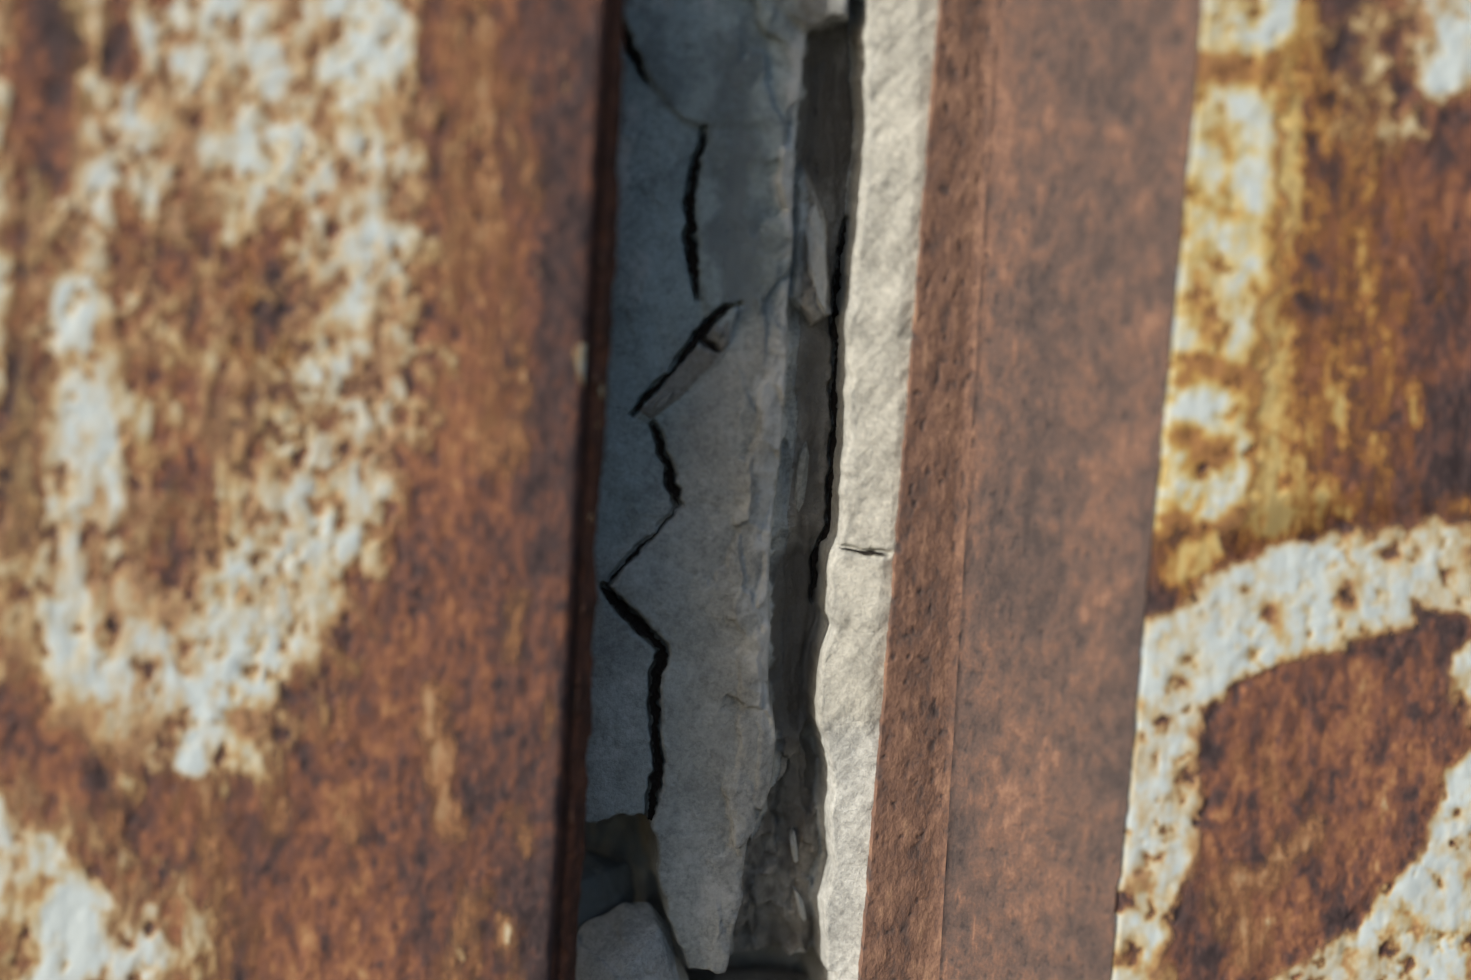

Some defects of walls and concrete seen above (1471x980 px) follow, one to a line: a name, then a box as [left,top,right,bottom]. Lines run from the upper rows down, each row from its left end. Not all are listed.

rust [63,0,112,43]
crack [623,28,645,80]
rust [436,0,544,481]
rust [1158,0,1424,599]
crack [601,131,735,821]
crack [811,221,884,598]
rust [502,589,530,663]
rust [417,680,468,842]
rust [173,772,260,980]
rust [441,887,523,980]
rust [1205,814,1325,972]